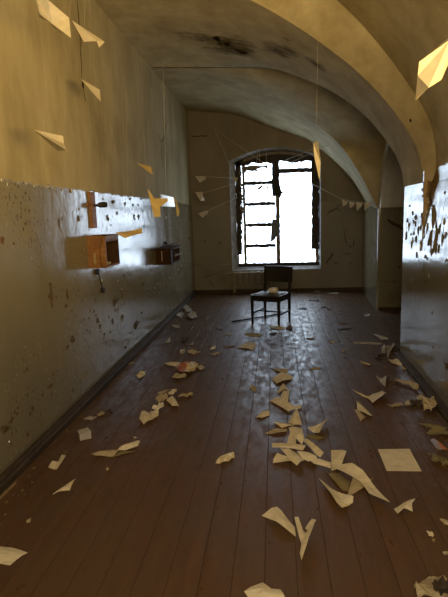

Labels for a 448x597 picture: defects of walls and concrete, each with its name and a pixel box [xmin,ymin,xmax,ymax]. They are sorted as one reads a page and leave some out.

crack [77,3,86,100]
peeling [387,172,446,273]